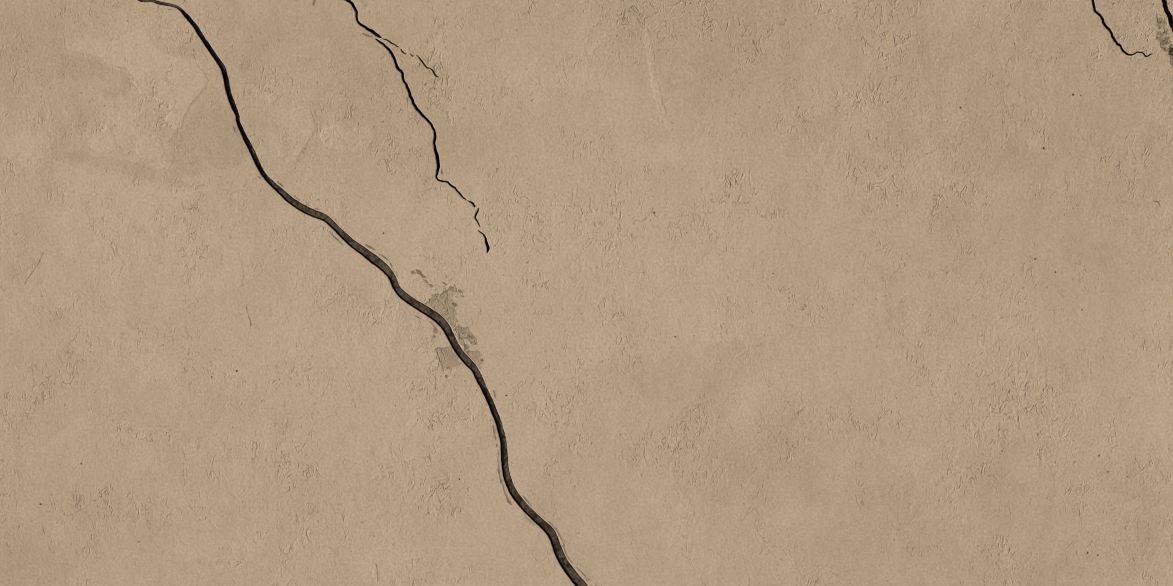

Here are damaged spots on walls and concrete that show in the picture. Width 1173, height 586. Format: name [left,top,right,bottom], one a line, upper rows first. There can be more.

crack [137,0,589,586]
crack [1091,0,1173,58]